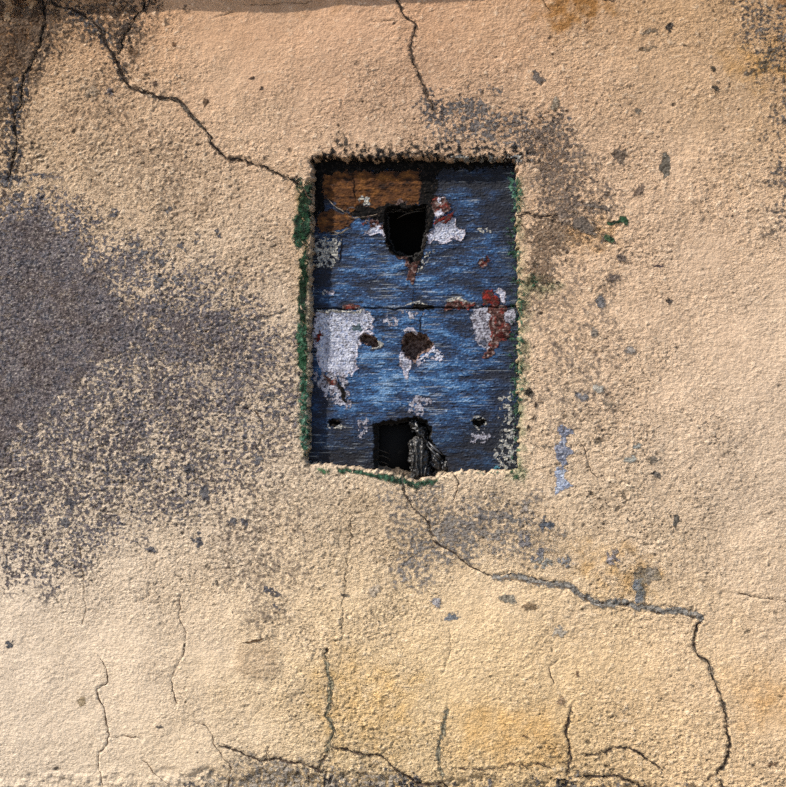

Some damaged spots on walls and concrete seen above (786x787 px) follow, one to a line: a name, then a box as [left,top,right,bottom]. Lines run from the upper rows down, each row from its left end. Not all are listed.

spalling [73,81,155,163]
crack [7,0,312,200]
crack [373,0,436,113]
peeling [412,85,644,495]
peeling [0,166,465,626]
crack [171,596,186,703]
spalling [498,594,537,611]
crack [402,472,731,787]
crack [96,660,140,786]
leakage [168,751,438,787]
crack [195,648,663,787]
leakage [526,770,629,787]